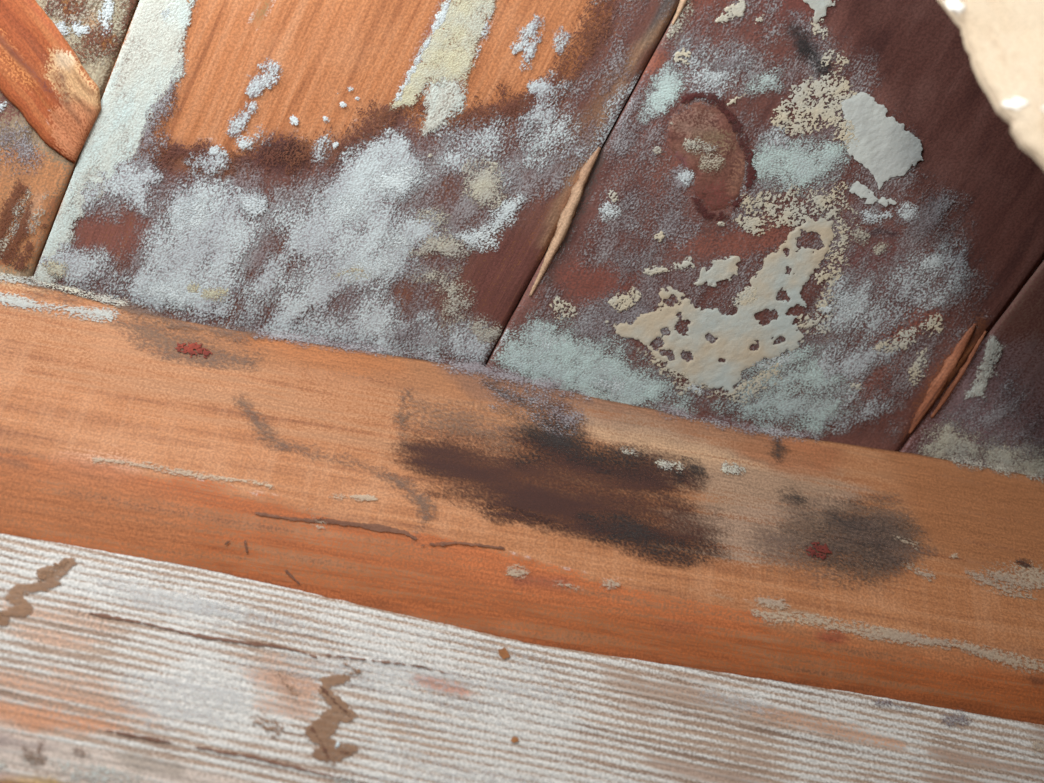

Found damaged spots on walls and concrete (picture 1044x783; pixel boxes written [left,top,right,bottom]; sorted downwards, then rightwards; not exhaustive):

peeling [605,0,923,406]
peeling [549,296,578,320]
leakage [506,565,528,578]
leakage [760,497,935,581]